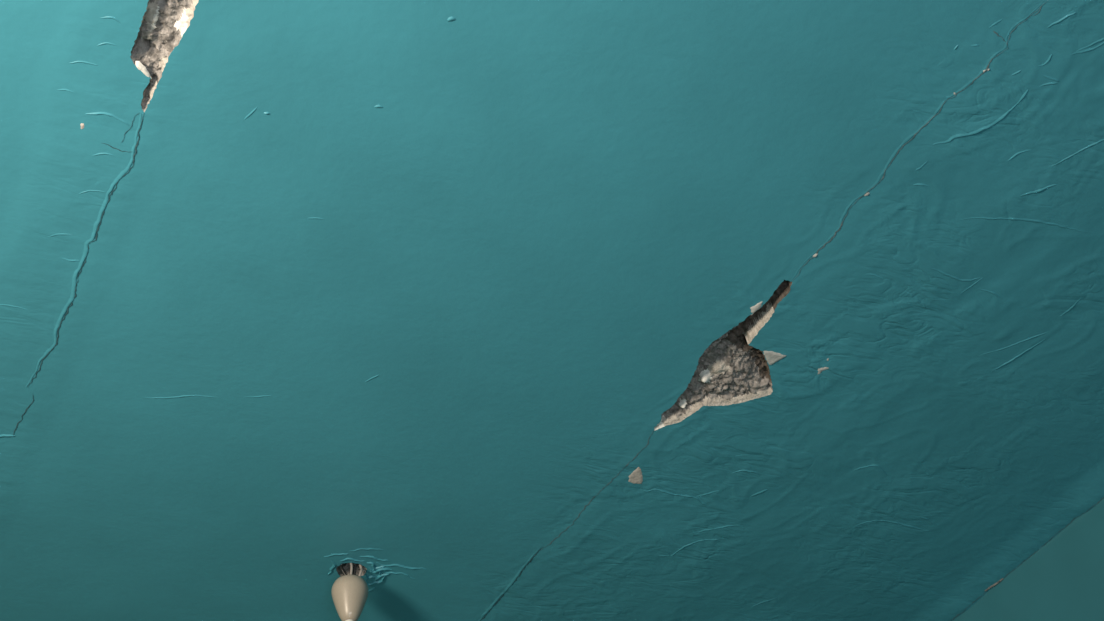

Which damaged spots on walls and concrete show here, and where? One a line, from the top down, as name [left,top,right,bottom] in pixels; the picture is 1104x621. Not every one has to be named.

flaking render [130,0,199,112]
crack [13,112,144,435]
flaking render [654,280,792,431]
peeling [628,467,643,484]